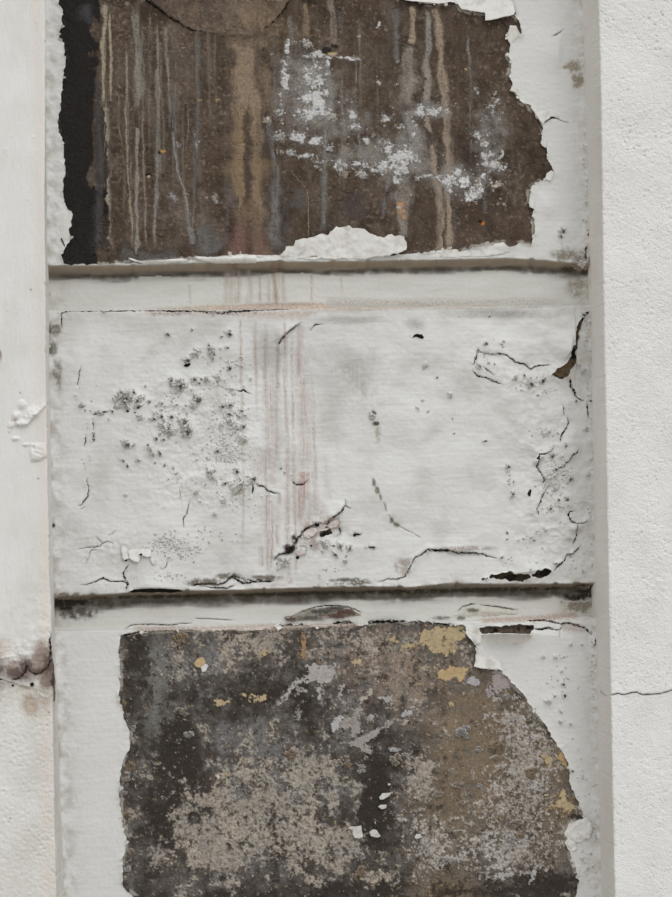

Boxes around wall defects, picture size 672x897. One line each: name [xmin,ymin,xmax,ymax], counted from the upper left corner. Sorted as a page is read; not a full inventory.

crack [146,0,289,77]
water stain [58,0,508,266]
peeling [86,0,554,265]
crack [473,352,548,384]
crack [536,379,589,515]
crack [86,566,129,592]
crack [192,503,349,589]
crack [372,479,494,582]
crack [554,511,587,571]
peeling [118,606,593,897]